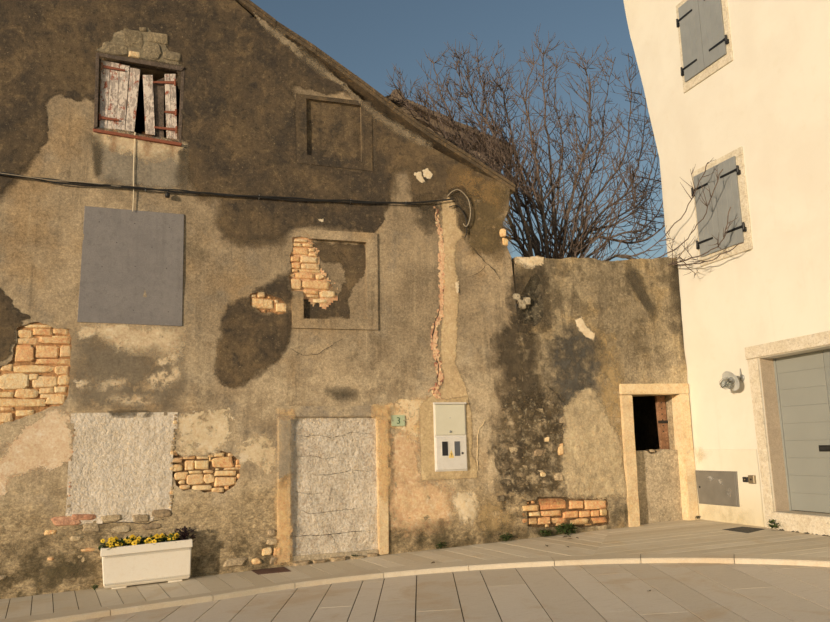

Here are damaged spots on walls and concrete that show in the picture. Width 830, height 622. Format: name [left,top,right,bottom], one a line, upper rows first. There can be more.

leakage [92,132,187,188]
peeling [0,0,496,388]
leakage [416,200,437,229]
leakage [449,185,509,254]
spalling [0,288,77,496]
spalling [44,407,276,552]
leakage [416,525,472,547]
leakage [480,319,622,543]
peeling [522,388,627,528]
spalling [575,316,595,340]